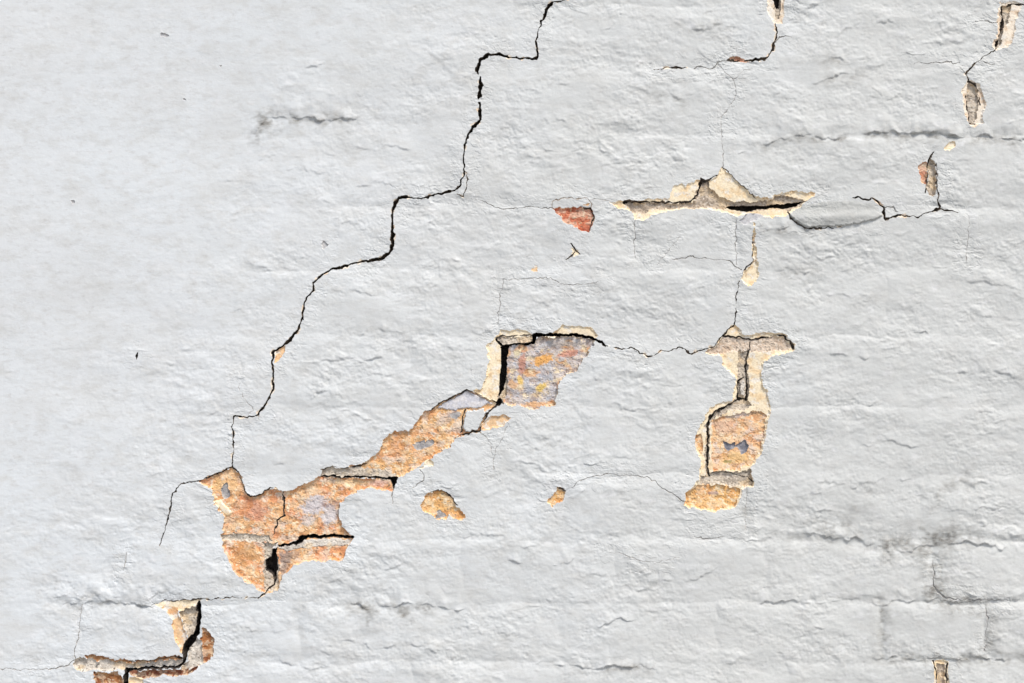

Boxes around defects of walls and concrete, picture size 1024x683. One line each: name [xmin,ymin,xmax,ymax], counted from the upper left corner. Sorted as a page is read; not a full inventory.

crack [653,24,792,168]
crack [230,0,569,468]
spalling [552,197,595,233]
crack [605,219,742,358]
spalling [609,167,815,286]
crack [787,212,843,230]
crack [853,196,970,262]
spalling [918,141,956,208]
crack [159,480,200,546]
spalling [198,324,606,595]
spalling [683,325,796,513]
spalling [73,598,215,683]